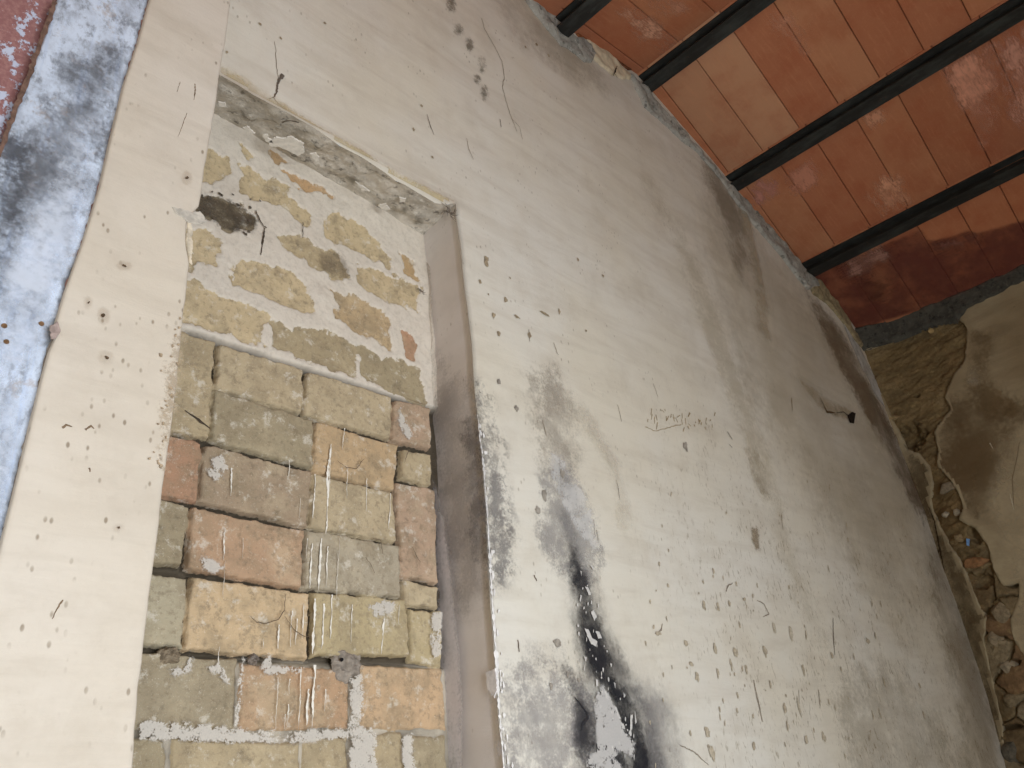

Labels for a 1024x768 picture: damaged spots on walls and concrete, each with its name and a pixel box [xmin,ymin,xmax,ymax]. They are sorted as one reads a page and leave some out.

crack [269,41,284,106]
crack [482,21,523,139]
spalling [214,75,456,235]
spalling [172,207,206,265]
flaking render [864,321,1024,768]